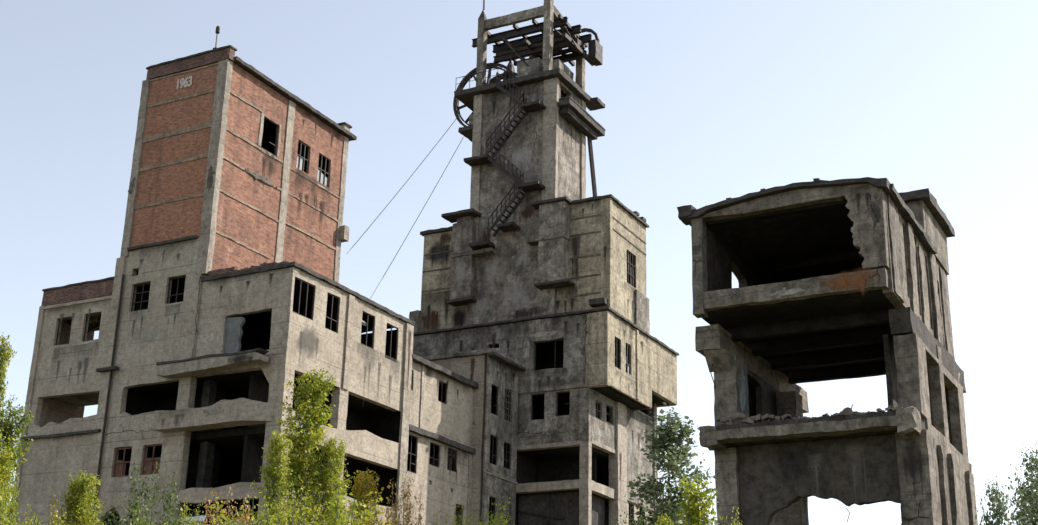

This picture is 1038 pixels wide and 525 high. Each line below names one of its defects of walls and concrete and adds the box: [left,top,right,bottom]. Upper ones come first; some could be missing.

corrosion [829,272,869,292]
leakage [427,290,465,334]
leakage [300,332,319,354]